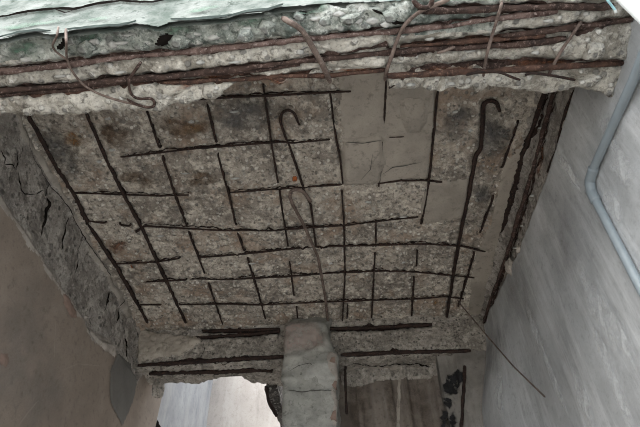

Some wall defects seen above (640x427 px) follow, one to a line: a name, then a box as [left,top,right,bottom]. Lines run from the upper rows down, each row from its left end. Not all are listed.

spalling [0,42,313,87]
spalling [0,0,632,73]
crack [1,139,128,357]
spalling [0,63,621,383]